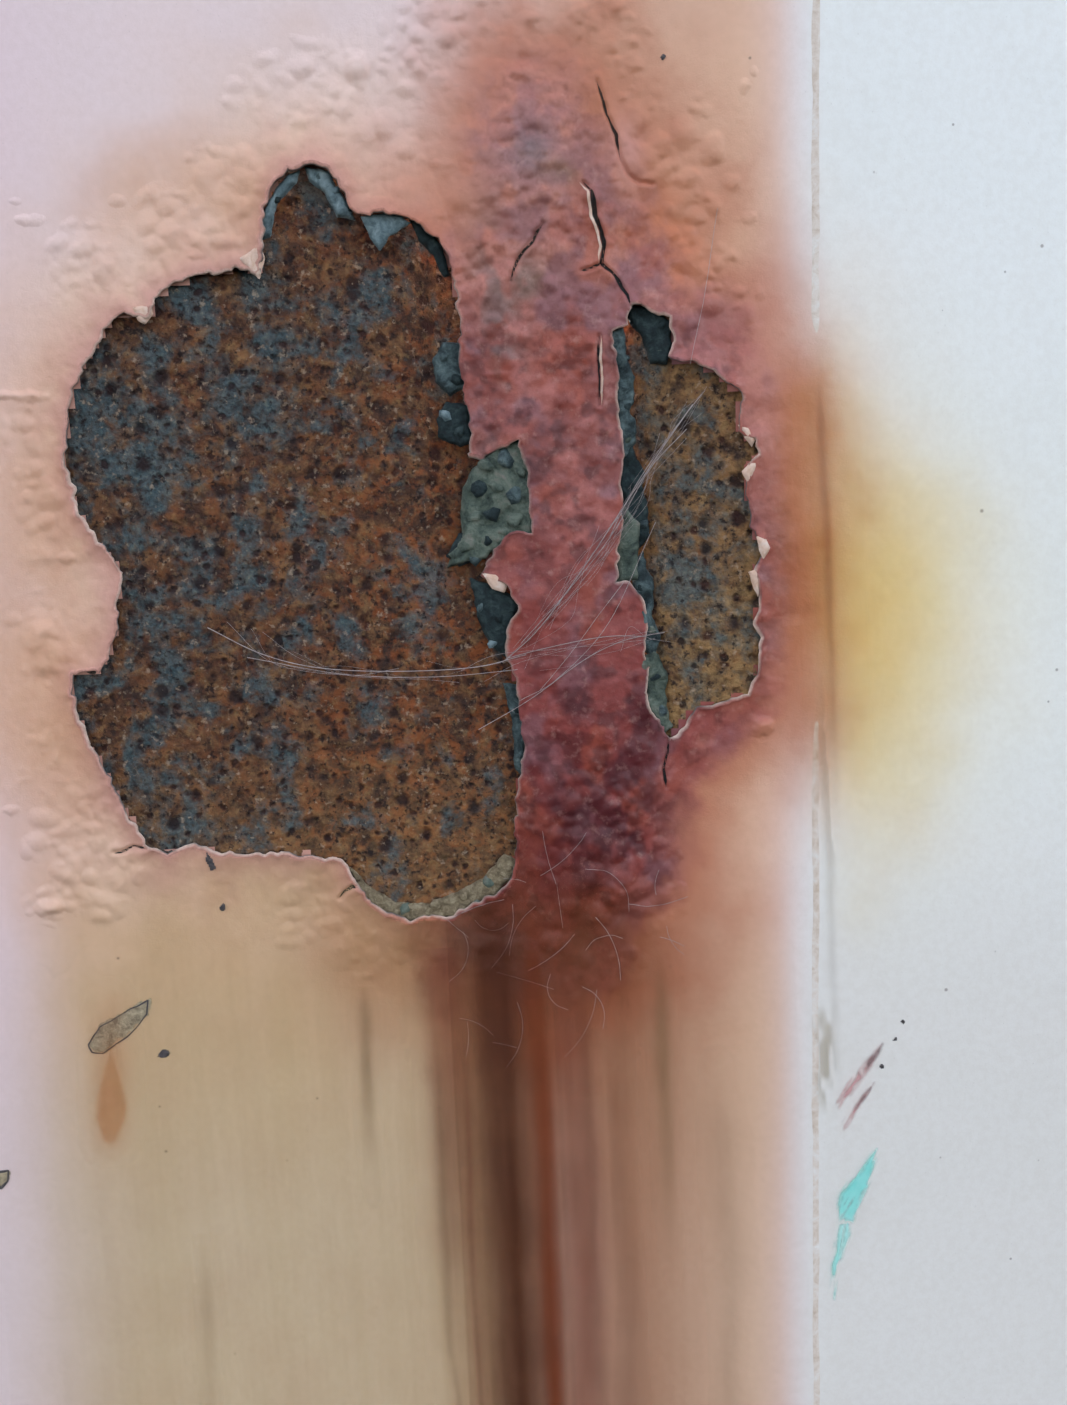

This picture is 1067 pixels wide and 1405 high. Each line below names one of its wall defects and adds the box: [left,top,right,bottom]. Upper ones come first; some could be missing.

crack [580,182,630,304]
crack [597,83,620,156]
peeling [60,160,535,924]
peeling [610,300,770,741]